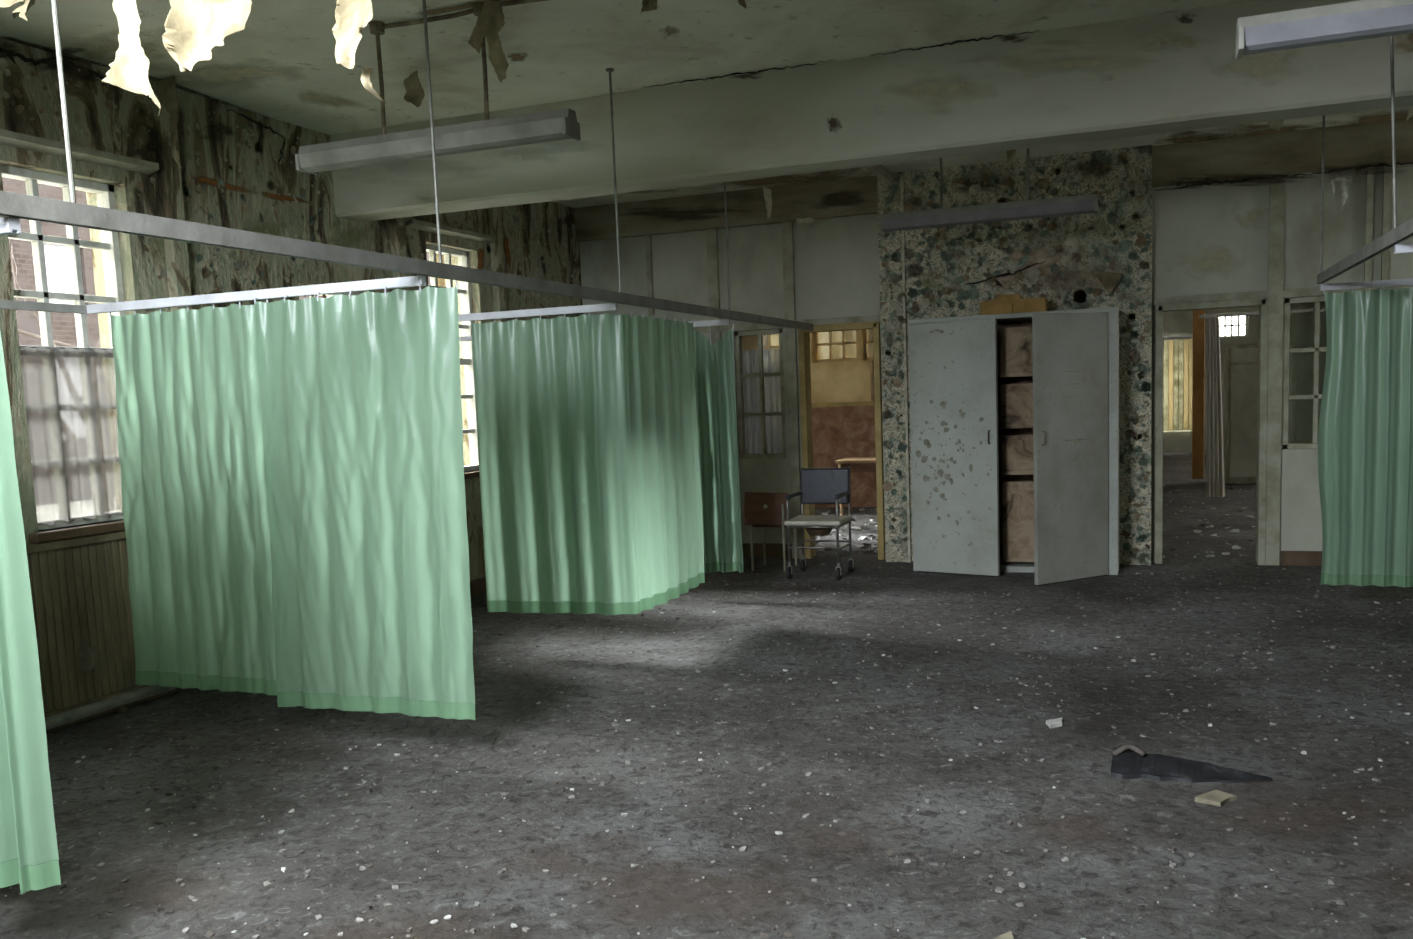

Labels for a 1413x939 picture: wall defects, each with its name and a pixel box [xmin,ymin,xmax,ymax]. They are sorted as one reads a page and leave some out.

crack [0,48,105,80]
damp [0,37,111,82]
damp [148,76,264,156]
damp [177,109,186,189]
damp [134,189,143,214]
damp [247,227,277,235]